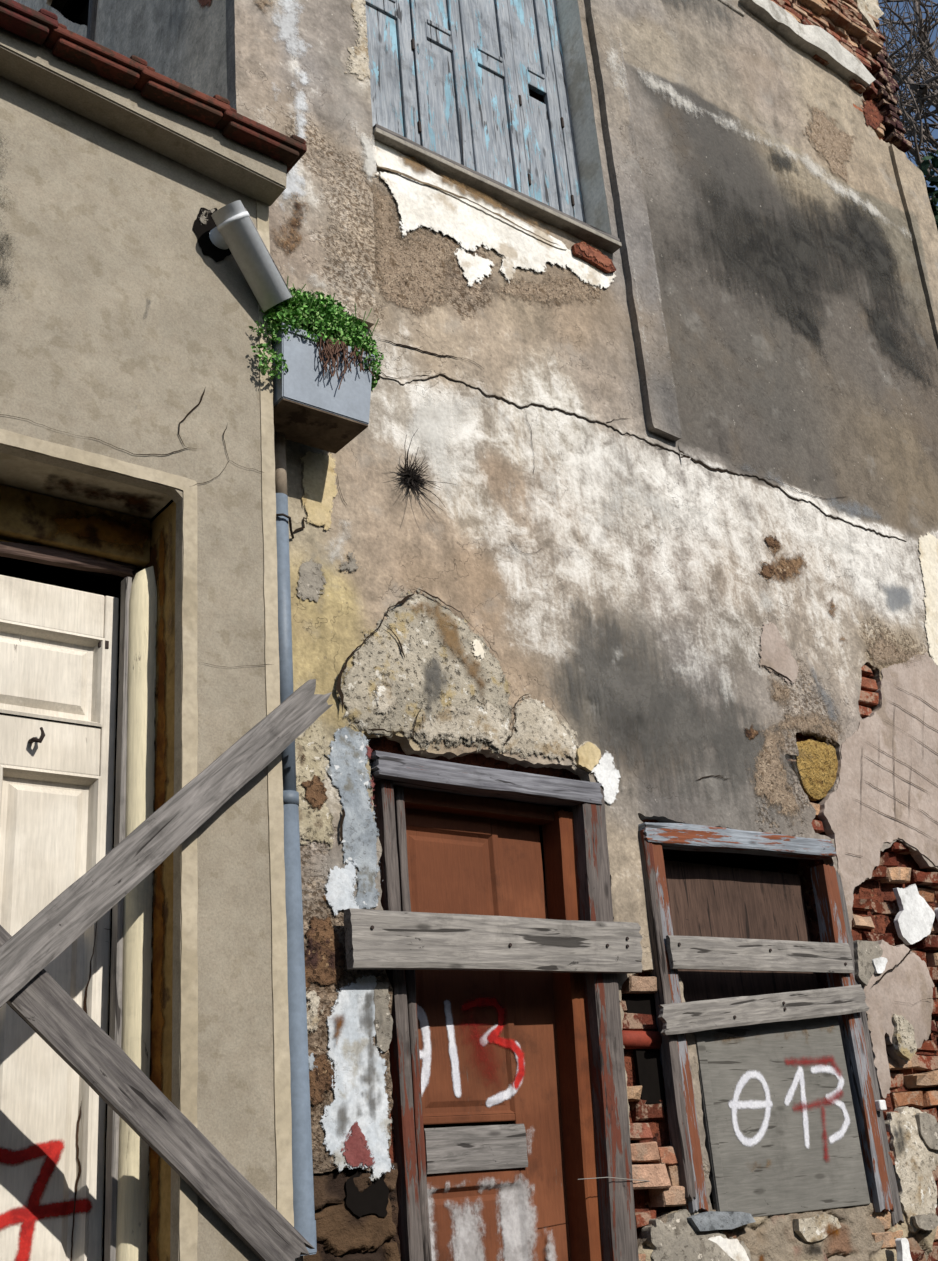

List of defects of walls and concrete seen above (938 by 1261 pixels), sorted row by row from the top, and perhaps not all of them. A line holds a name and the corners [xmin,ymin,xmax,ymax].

water stain [648,76,692,108]
spalling [853,99,885,138]
peeling [362,136,616,317]
water stain [697,148,931,387]
crack [0,387,264,486]
peeling [293,451,362,602]
crack [378,339,907,541]
spalling [744,622,843,833]
peeling [295,720,401,1261]
flaking render [620,975,658,1031]
flaking render [852,840,938,1166]
flaking render [627,1049,938,1261]